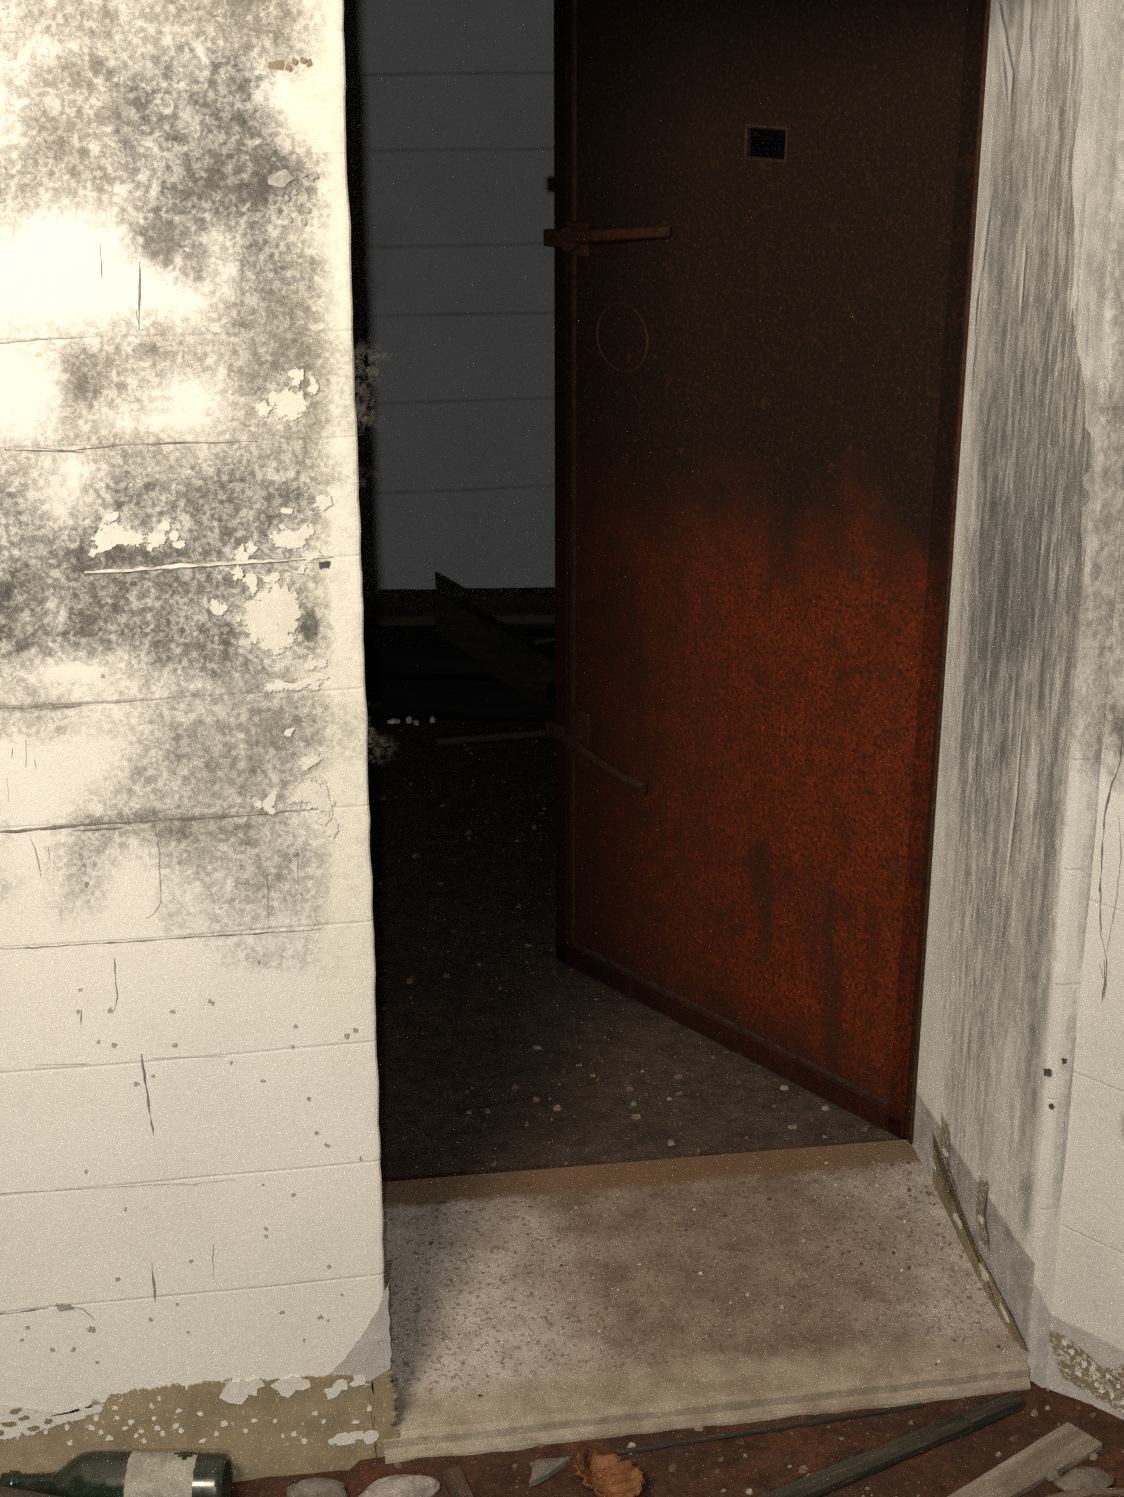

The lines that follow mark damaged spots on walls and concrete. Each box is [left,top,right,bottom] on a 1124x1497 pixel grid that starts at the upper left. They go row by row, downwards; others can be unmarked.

damp [0,0,327,903]
damp [961,0,1124,1145]
peeling [928,1115,1026,1350]
peeling [0,1283,400,1482]
peeling [1049,1331,1124,1414]